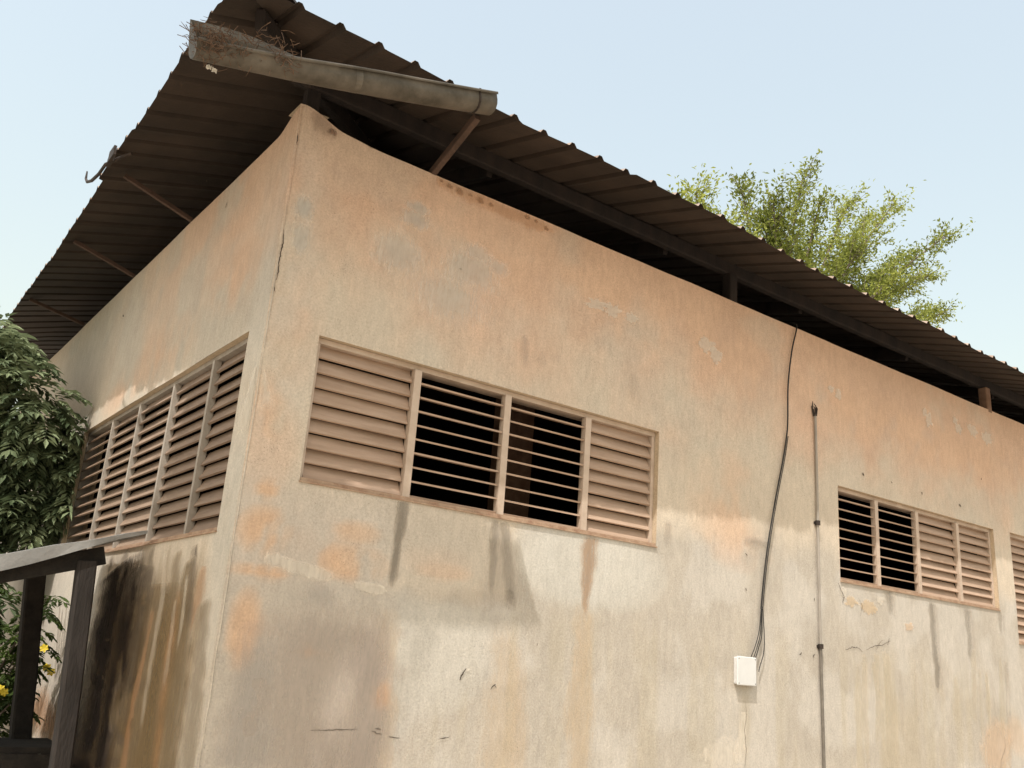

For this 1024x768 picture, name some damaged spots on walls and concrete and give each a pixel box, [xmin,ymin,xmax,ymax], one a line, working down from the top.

water stain [390,502,408,582]
water stain [490,523,514,602]
water stain [71,555,208,768]
water stain [930,604,940,685]